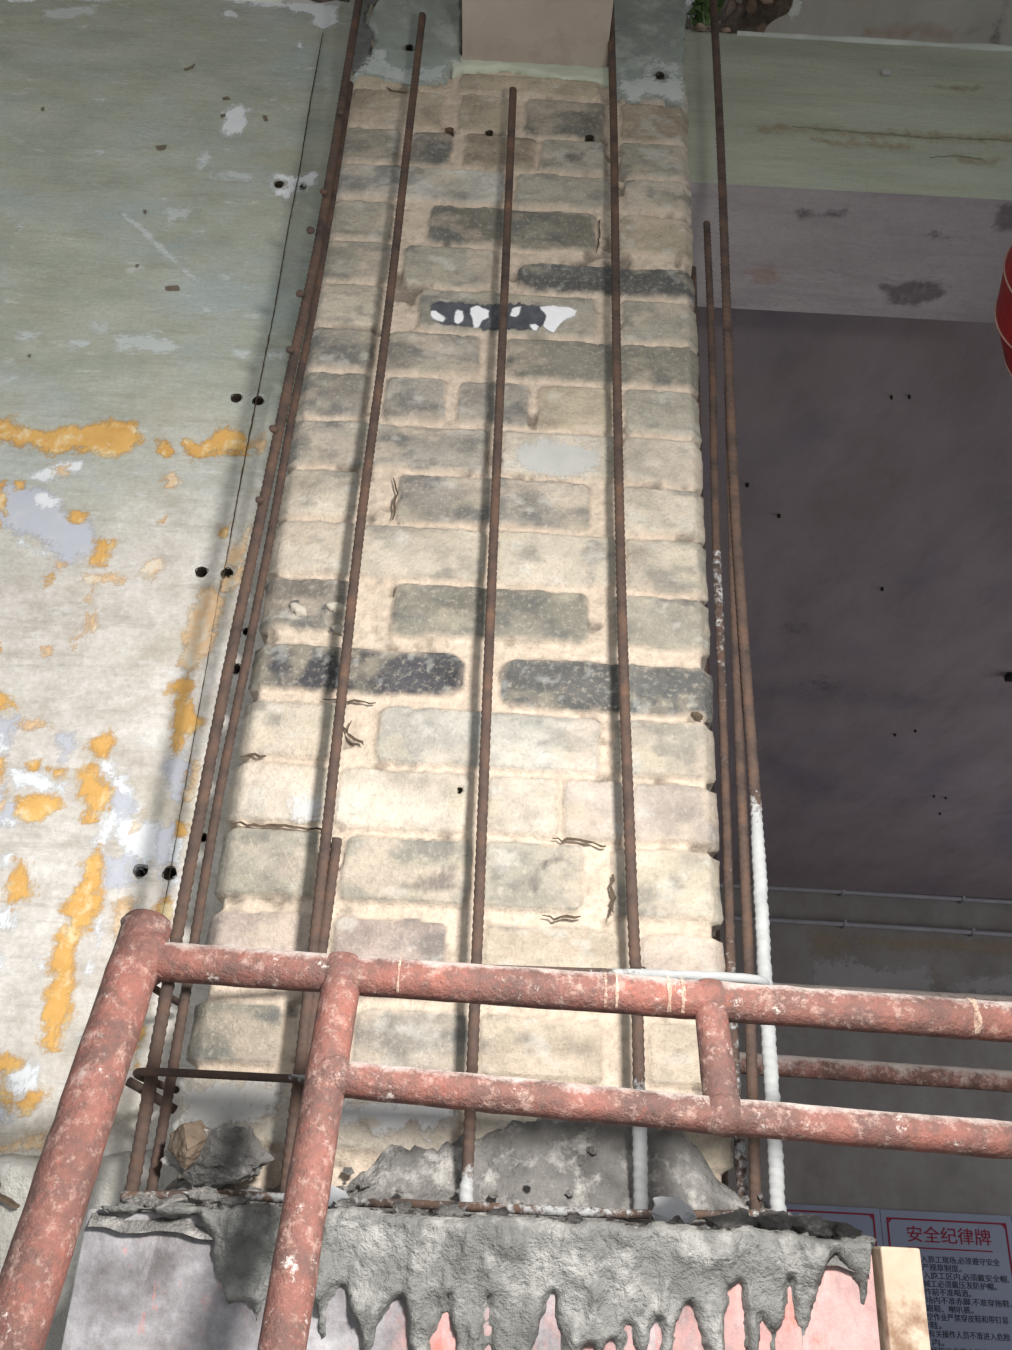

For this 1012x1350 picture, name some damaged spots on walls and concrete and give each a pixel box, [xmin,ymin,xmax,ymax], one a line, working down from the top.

spalling [0,0,376,1123]
spalling [289,12,426,953]
crack [0,1183,20,1209]